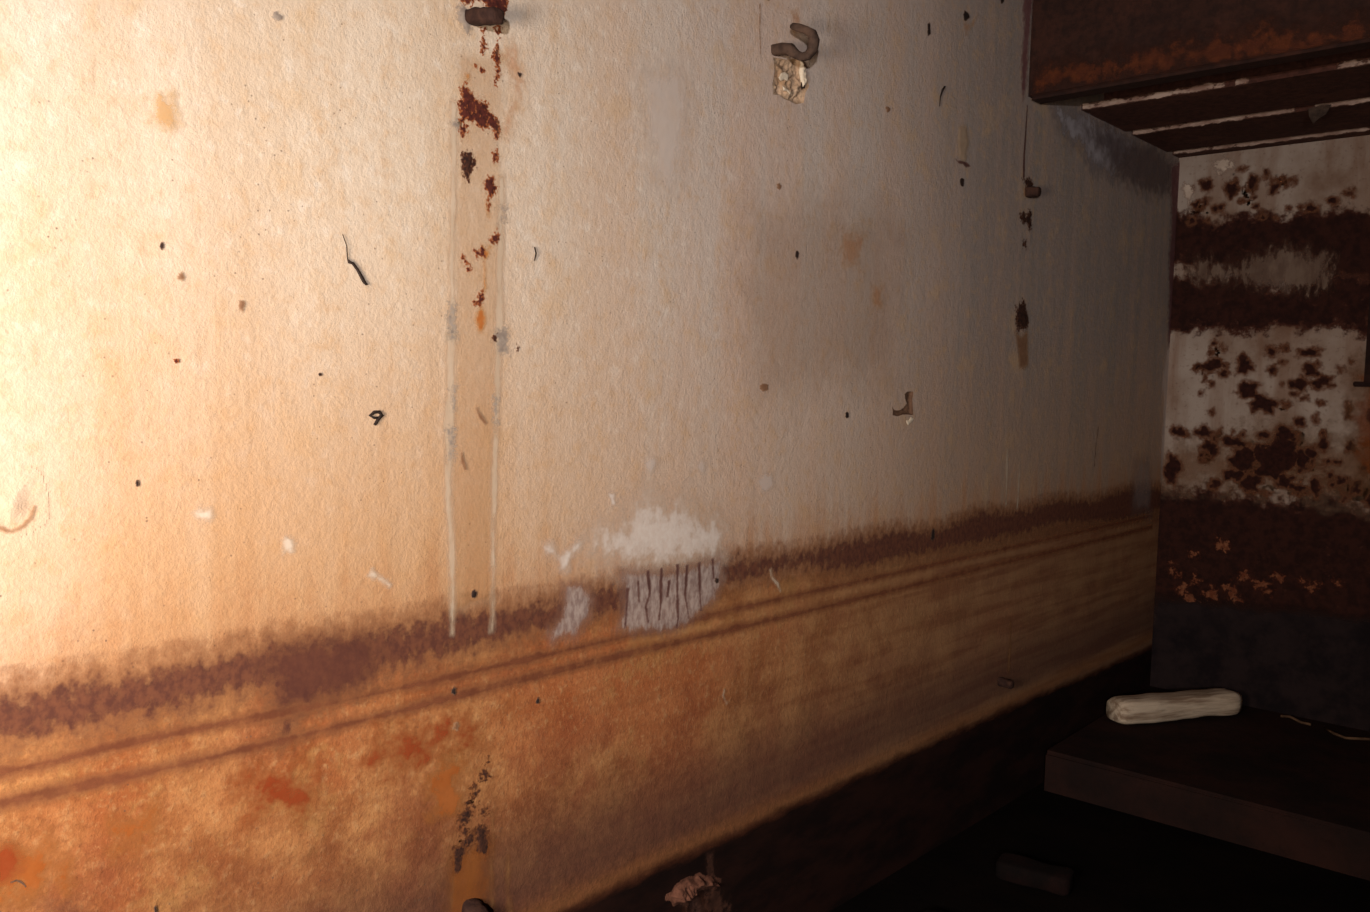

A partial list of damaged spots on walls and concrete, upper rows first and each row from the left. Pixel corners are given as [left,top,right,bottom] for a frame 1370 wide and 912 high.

rust [1033,12,1370,93]
rust [1155,165,1370,617]
damp [0,484,1161,810]
rust [235,764,310,824]
rust [0,841,70,904]
rust [452,846,488,912]
spalling [665,872,731,912]